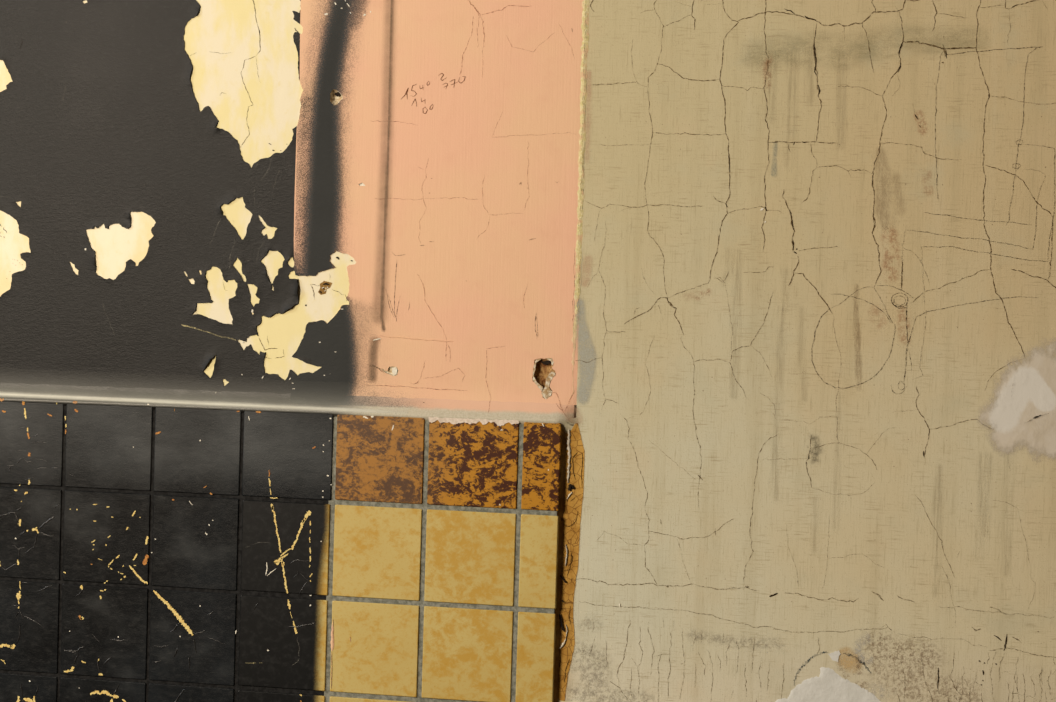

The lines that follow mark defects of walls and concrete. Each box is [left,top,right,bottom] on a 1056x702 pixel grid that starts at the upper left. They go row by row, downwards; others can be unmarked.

peeling [0,60,12,92]
peeling [183,0,303,168]
peeling [0,201,31,296]
peeling [85,211,156,280]
peeling [184,197,356,389]
hole [532,358,574,410]
crack [511,0,1056,702]
crack [14,401,38,533]
crack [90,690,126,702]